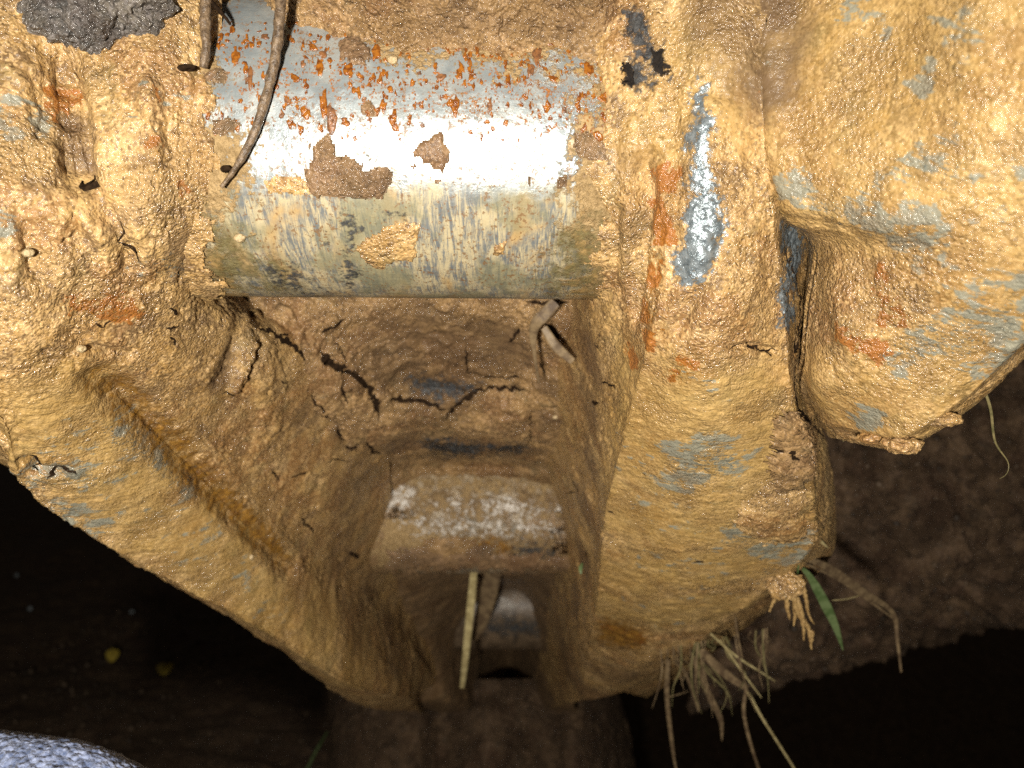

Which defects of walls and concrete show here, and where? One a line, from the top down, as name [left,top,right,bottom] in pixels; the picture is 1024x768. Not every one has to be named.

corrosion [205,21,607,143]
peeling [620,5,674,97]
crack [488,300,568,343]
crack [728,247,826,461]
crack [260,319,546,482]
crack [30,455,77,479]
damp [387,485,564,560]